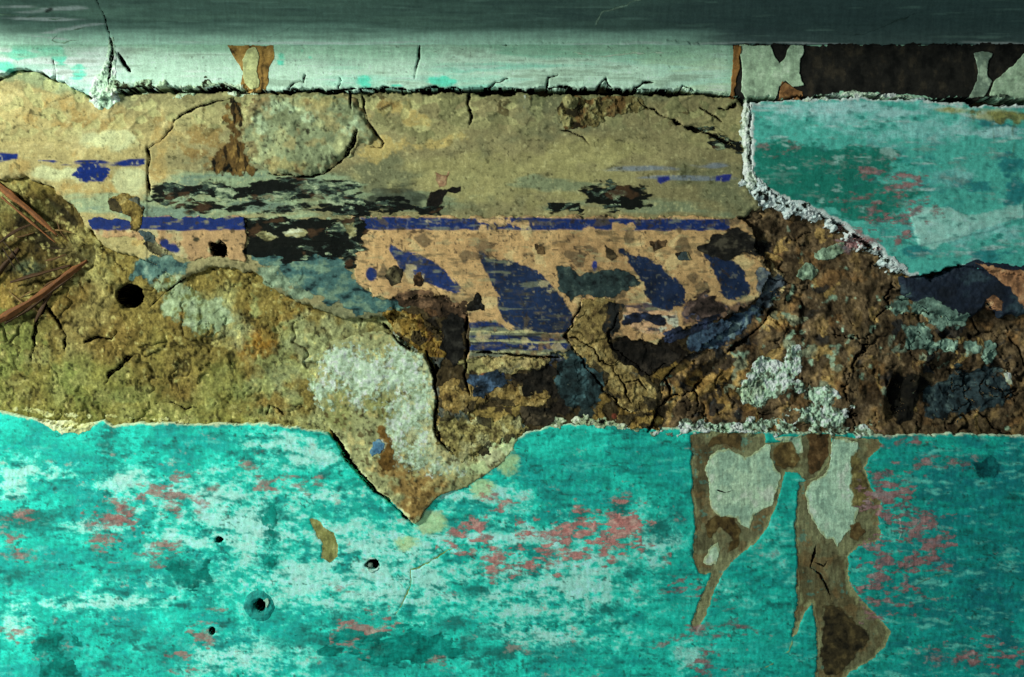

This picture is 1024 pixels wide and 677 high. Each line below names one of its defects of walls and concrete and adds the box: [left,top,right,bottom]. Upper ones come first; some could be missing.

peeling [89,37,275,110]
crack [96,0,737,195]
peeling [728,42,1024,107]
flaking render [0,94,1024,635]
crack [463,302,704,432]
crack [725,308,772,354]
crack [835,282,896,429]
peeling [792,436,958,677]
peeling [329,617,401,650]
peeling [686,650,726,677]
peeling [954,635,1024,675]